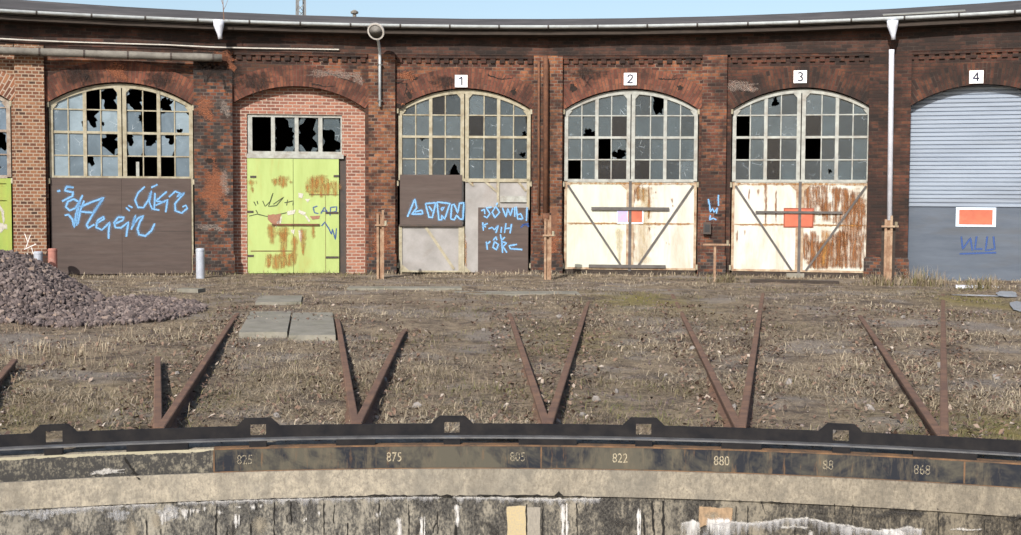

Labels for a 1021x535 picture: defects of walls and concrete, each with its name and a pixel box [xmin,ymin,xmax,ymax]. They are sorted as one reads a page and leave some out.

rust [306,176,337,196]
rust [736,183,866,269]
rust [267,225,315,268]
water stain [454,496,600,535]
water stain [611,510,641,535]
water stain [682,506,923,535]